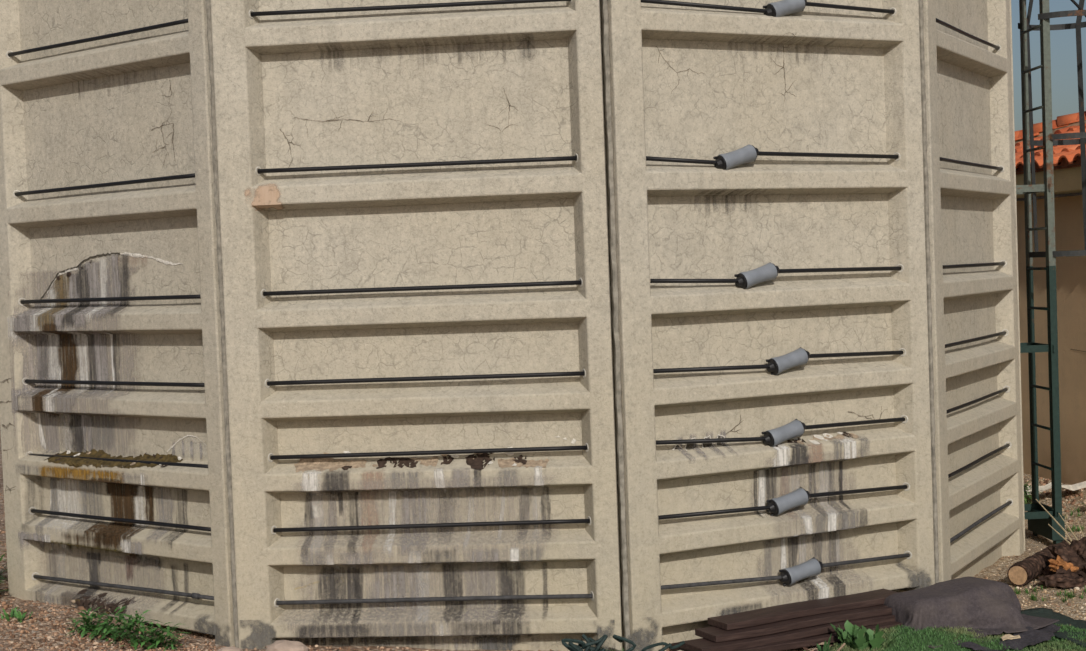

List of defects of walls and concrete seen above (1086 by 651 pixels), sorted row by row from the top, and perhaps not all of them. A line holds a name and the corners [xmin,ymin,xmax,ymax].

spalling [41,252,182,299]
water stain [8,255,136,455]
spalling [294,447,549,472]
water stain [754,438,867,600]
water stain [36,553,187,611]
water stain [285,466,550,651]
water stain [195,617,277,650]